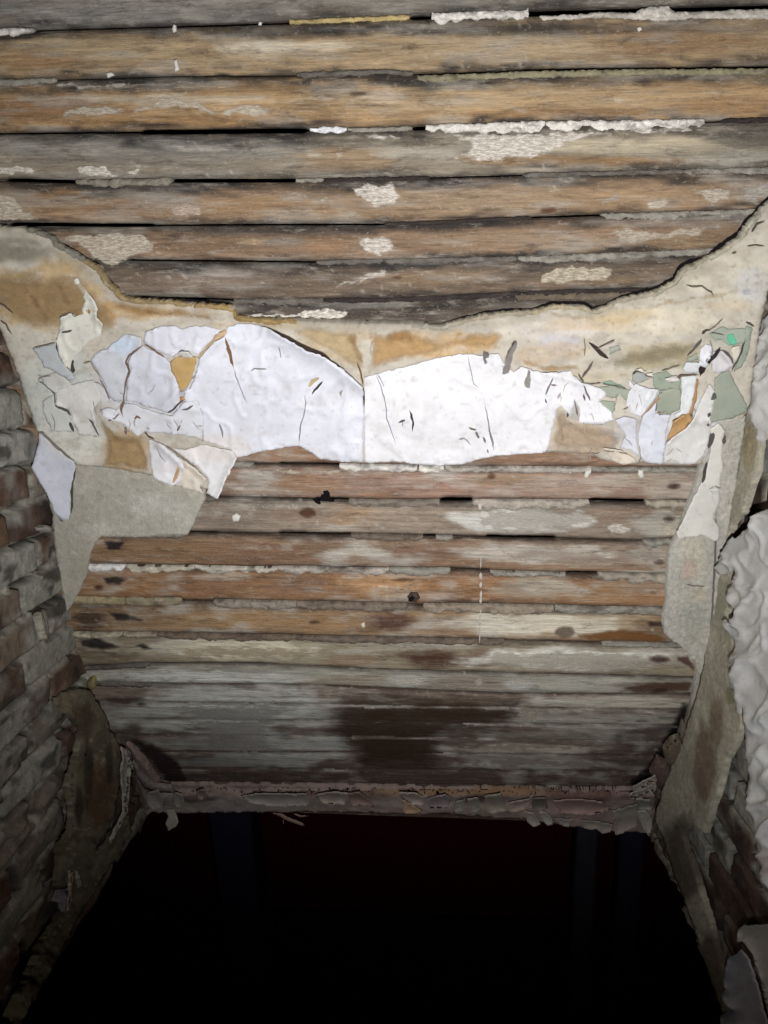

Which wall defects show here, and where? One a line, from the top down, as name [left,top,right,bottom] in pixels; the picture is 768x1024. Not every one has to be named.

spalling [412,200,768,331]
peeling [0,227,768,1024]
water stain [626,683,691,692]
water stain [132,740,186,782]
water stain [333,698,510,769]
water stain [632,704,687,785]